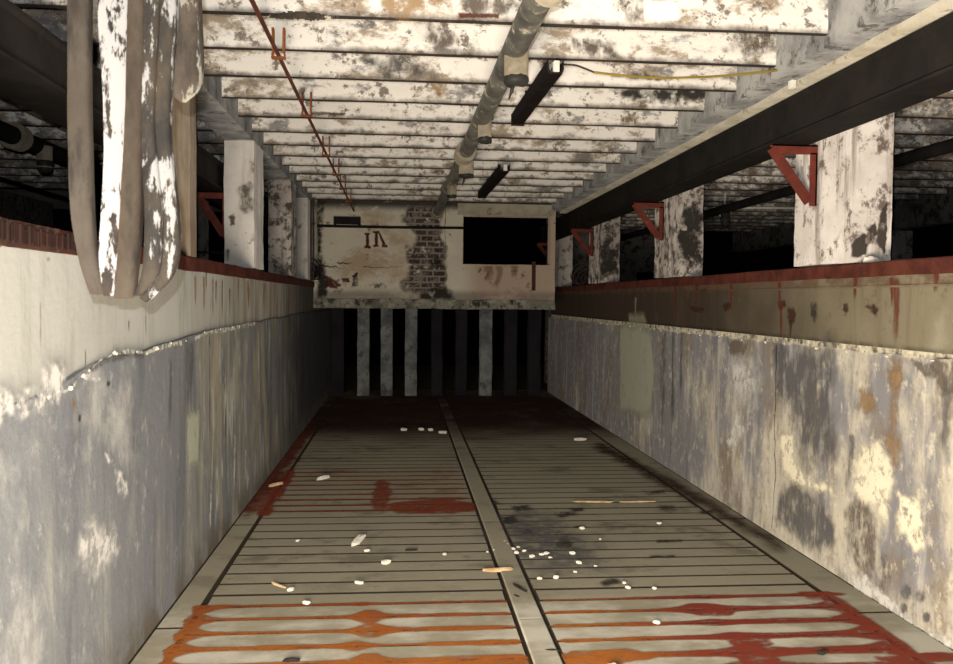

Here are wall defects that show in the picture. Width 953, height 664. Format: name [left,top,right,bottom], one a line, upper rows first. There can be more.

water stain [382,0,442,16]
water stain [462,0,511,14]
flaking render [400,206,447,293]
corrosion [778,282,796,335]
corrosion [890,278,899,328]
corrosion [859,390,875,413]
corrosion [887,360,902,466]
water stain [914,312,953,444]
water stain [777,485,833,548]